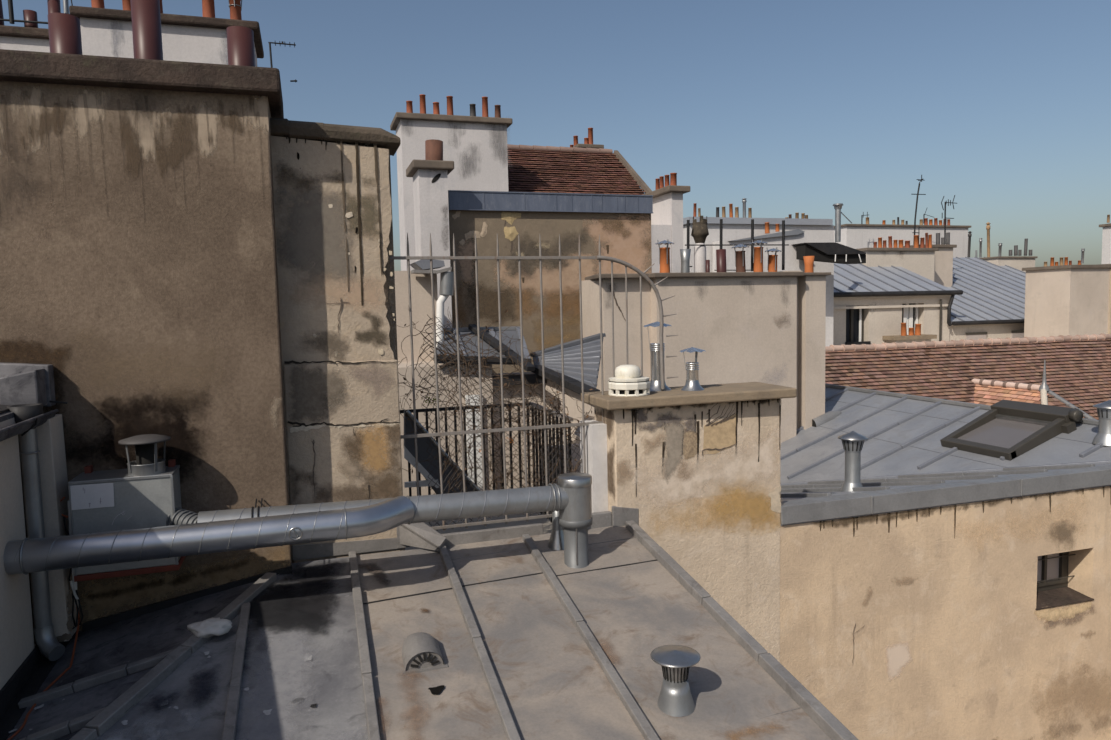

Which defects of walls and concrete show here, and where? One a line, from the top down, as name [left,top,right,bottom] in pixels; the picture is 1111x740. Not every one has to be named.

leakage [11,86,106,150]
leakage [120,96,269,176]
leakage [277,135,387,356]
peeling [456,222,488,285]
peeling [494,212,652,297]
crack [327,298,350,333]
crack [284,358,400,366]
leakage [317,424,402,501]
leakage [876,505,956,538]